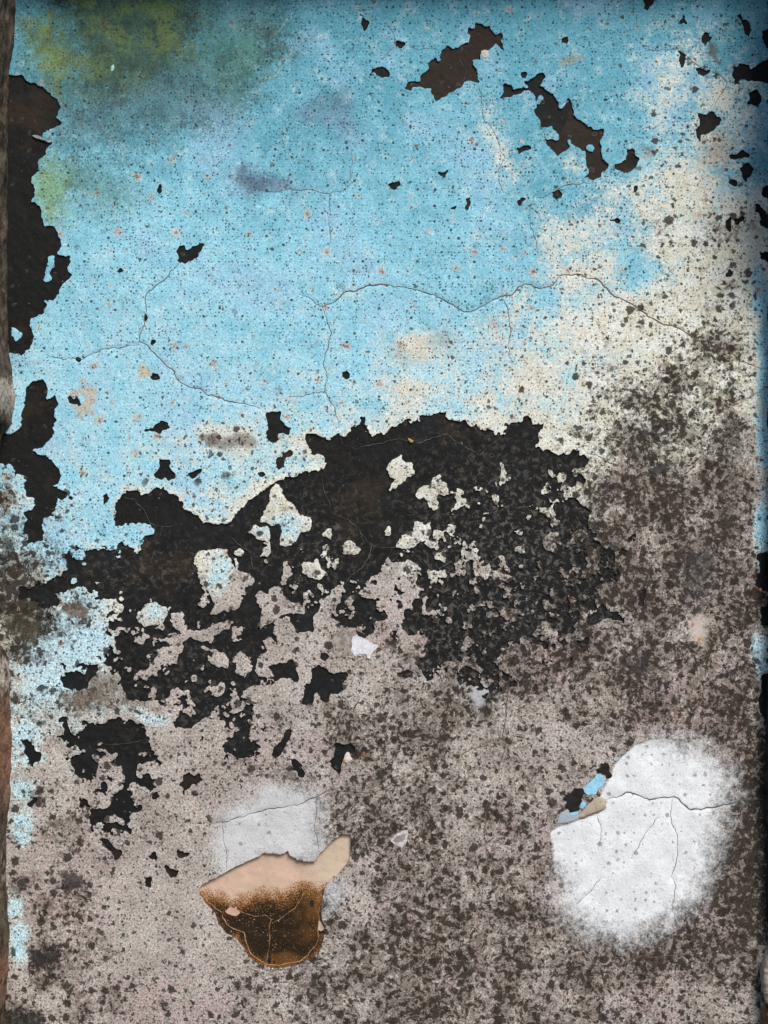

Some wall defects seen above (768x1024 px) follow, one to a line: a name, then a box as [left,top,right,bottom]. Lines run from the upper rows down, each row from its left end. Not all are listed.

peeling [405,23,504,101]
peeling [500,72,639,181]
peeling [6,75,72,356]
crack [46,265,261,409]
crack [292,273,768,455]
peeling [0,379,81,544]
peeling [19,411,636,778]
peeling [49,716,162,861]
peeling [179,773,203,794]
rust [199,880,328,968]
spalling [391,830,408,848]
crack [380,791,764,1024]